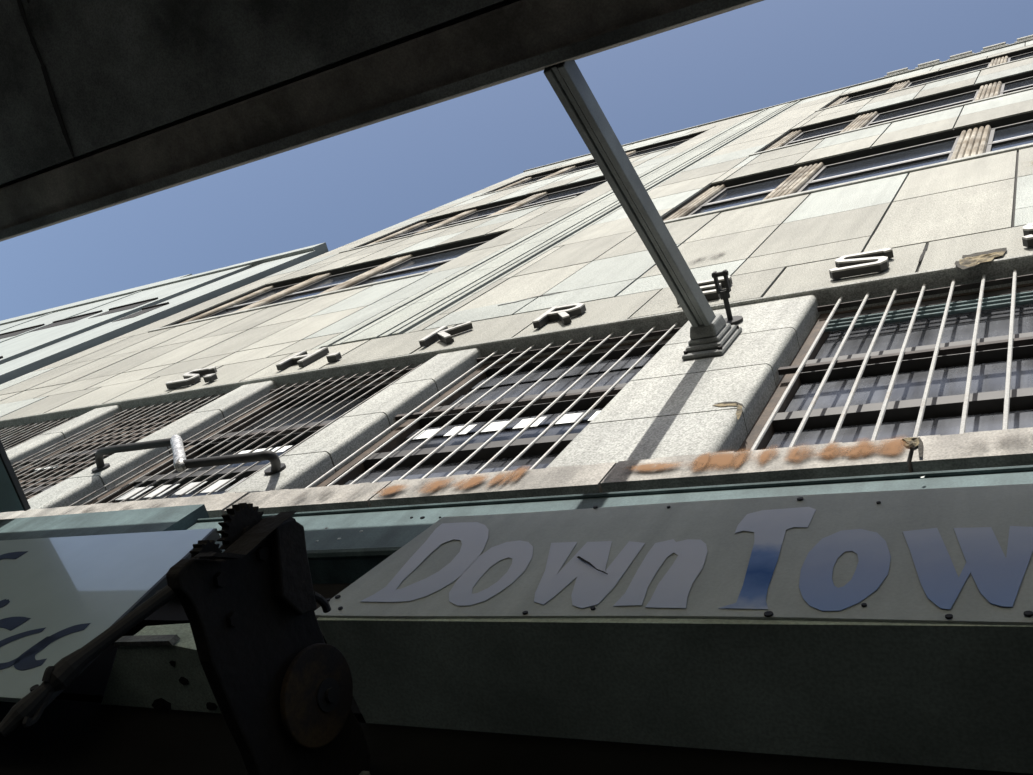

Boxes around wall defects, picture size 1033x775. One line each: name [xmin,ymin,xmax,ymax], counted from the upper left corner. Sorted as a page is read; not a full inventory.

rust [693,437,905,470]
rust [421,467,527,492]
rust [627,463,679,471]